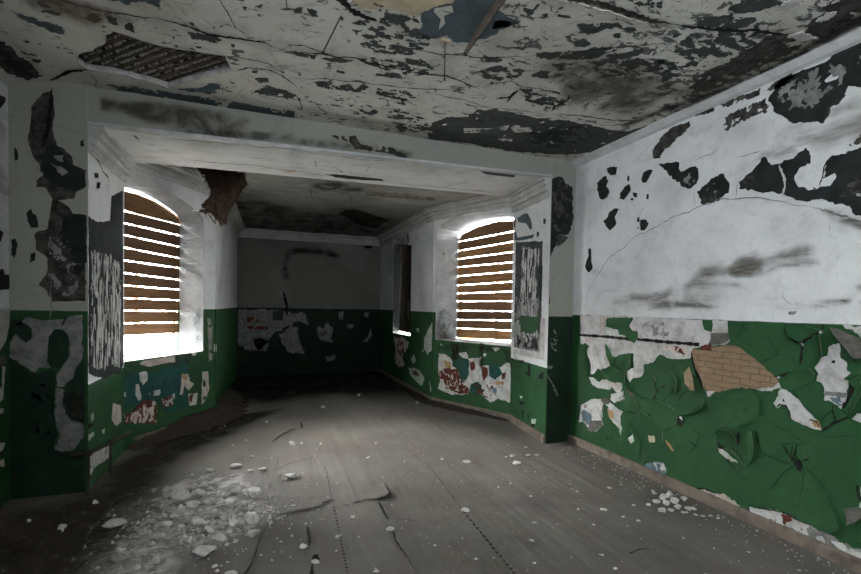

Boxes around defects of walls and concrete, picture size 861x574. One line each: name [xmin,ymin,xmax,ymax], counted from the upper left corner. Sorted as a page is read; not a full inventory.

peeling [0,41,42,80]
peeling [285,0,762,155]
peeling [597,166,617,200]
peeling [603,175,649,230]
crack [590,151,861,287]
peeling [641,43,861,216]
flaking render [0,308,105,452]
peeling [112,318,217,426]
flaking render [238,308,354,354]
flaking render [393,315,545,428]
peeling [572,314,861,489]
peeling [696,468,861,559]